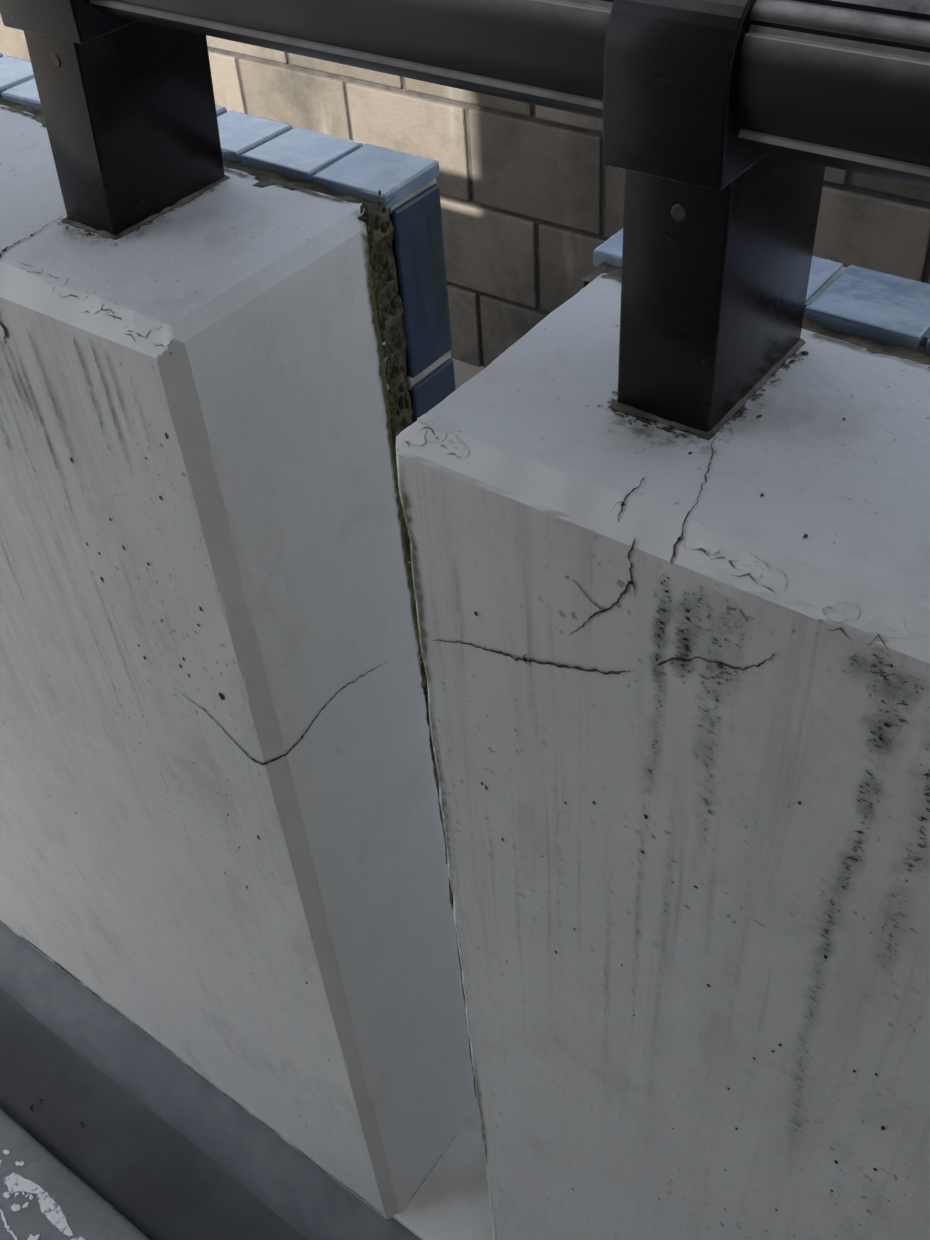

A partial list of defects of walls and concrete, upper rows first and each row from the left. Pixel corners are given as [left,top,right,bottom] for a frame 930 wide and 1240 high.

crack [0,217,61,257]
crack [0,322,8,344]
peeling [20,263,176,354]
crack [570,477,645,635]
crack [670,437,716,564]
crack [181,665,381,765]
crack [433,640,774,675]
leakage [652,575,695,709]
leakage [821,648,923,959]
leakage [903,764,930,881]